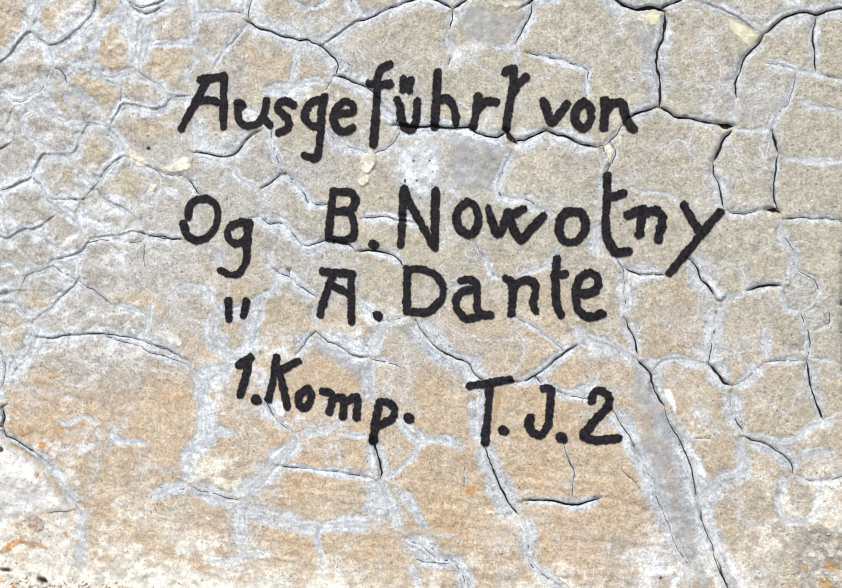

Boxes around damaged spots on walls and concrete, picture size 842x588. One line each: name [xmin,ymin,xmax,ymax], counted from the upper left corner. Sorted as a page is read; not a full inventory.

crack [0,0,373,435]
crack [237,253,484,381]
crack [330,0,842,588]
crack [0,350,50,464]
crack [151,382,411,534]
crack [50,495,86,574]